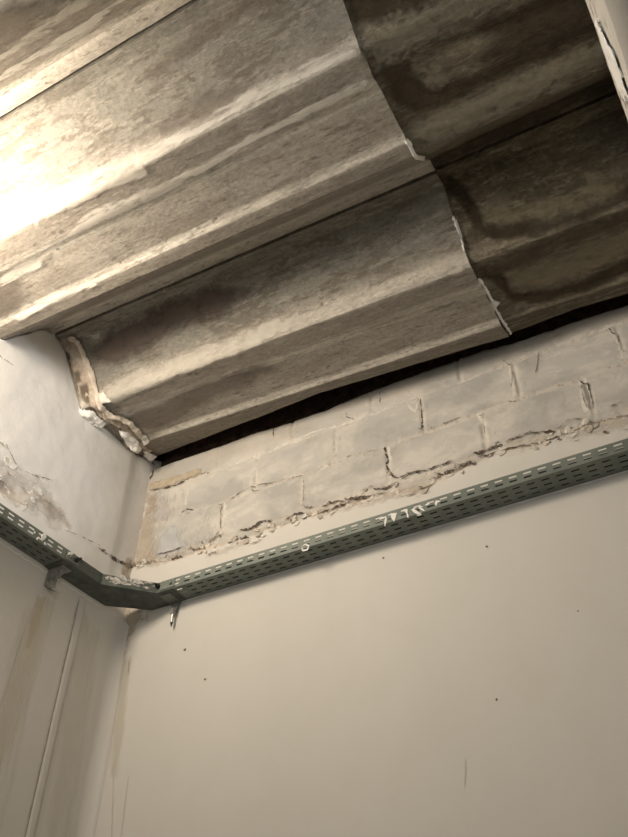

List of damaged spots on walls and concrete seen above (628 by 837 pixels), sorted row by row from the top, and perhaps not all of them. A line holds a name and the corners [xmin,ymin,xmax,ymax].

peeling [590,0,628,107]
leakage [35,0,615,239]
leakage [0,253,49,286]
leakage [447,172,628,303]
leakage [105,297,355,403]
crack [419,398,496,435]
crack [579,379,594,409]
crack [216,466,323,534]